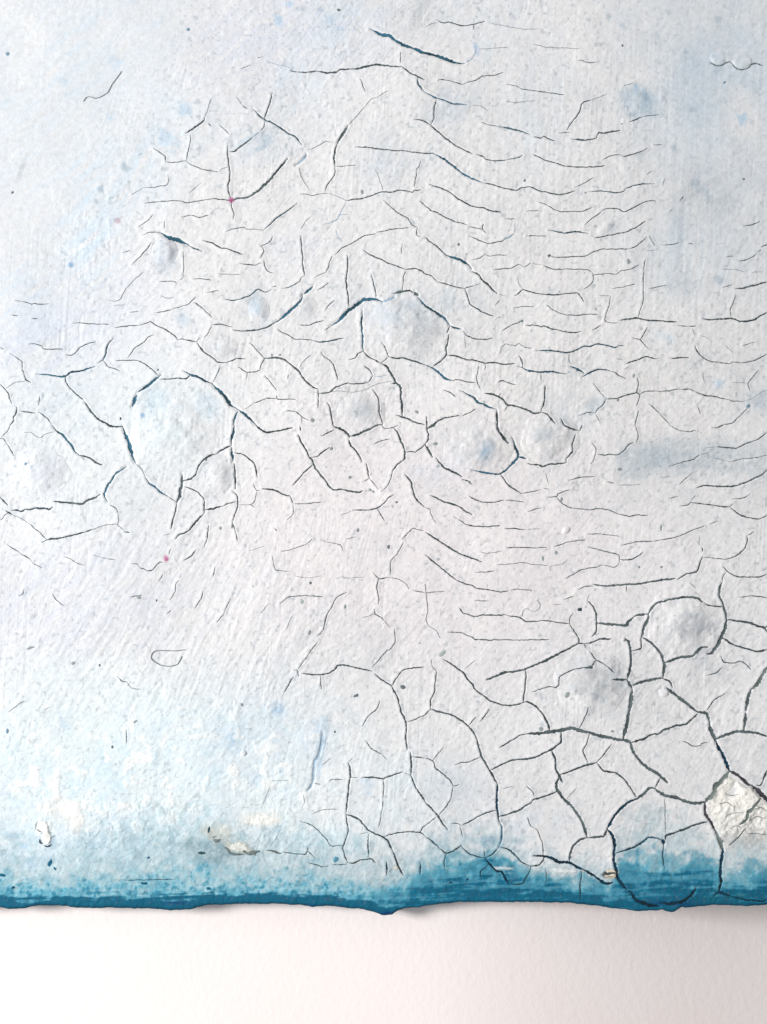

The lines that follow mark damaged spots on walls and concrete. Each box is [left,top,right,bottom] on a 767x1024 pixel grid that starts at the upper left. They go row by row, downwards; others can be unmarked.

crack [426,21,594,63]
crack [0,29,767,580]
crack [262,475,767,907]
peeling [203,825,280,856]
peeling [708,778,767,847]